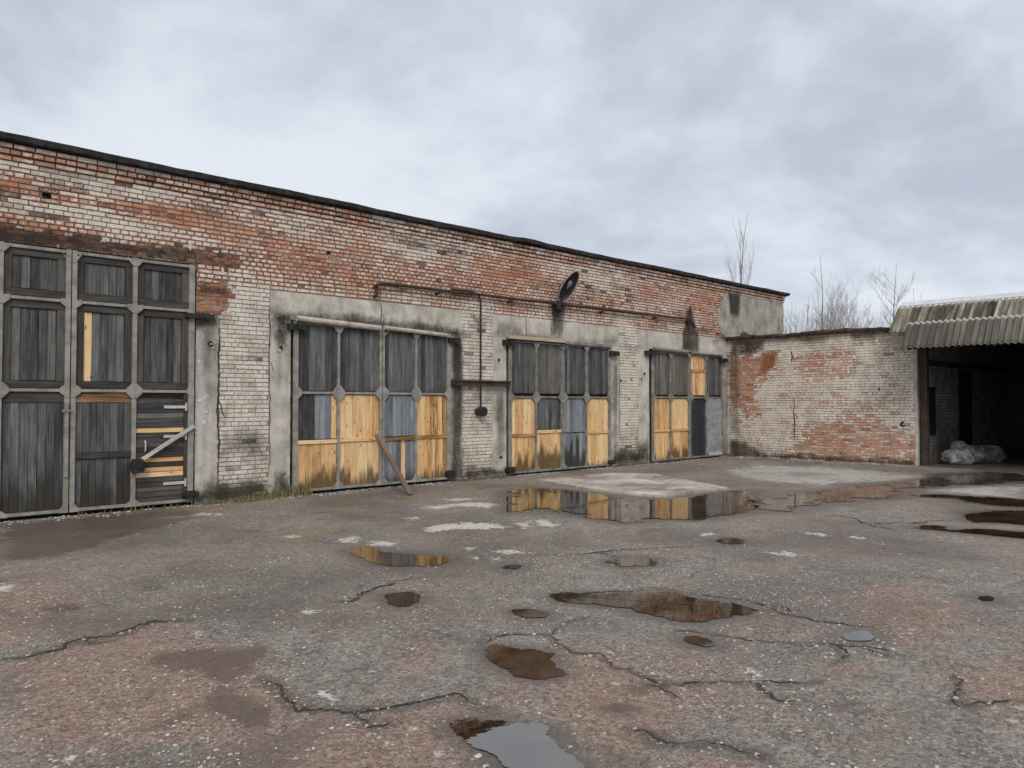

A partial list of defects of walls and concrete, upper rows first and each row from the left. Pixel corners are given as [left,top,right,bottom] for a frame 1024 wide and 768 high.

damp [0,226,88,248]
spalling [0,223,242,319]
damp [682,310,698,352]
peeling [727,350,857,420]
peeling [786,420,915,466]
crack [645,678,680,699]
crack [755,683,794,702]
crack [951,675,964,708]
crack [351,710,390,728]